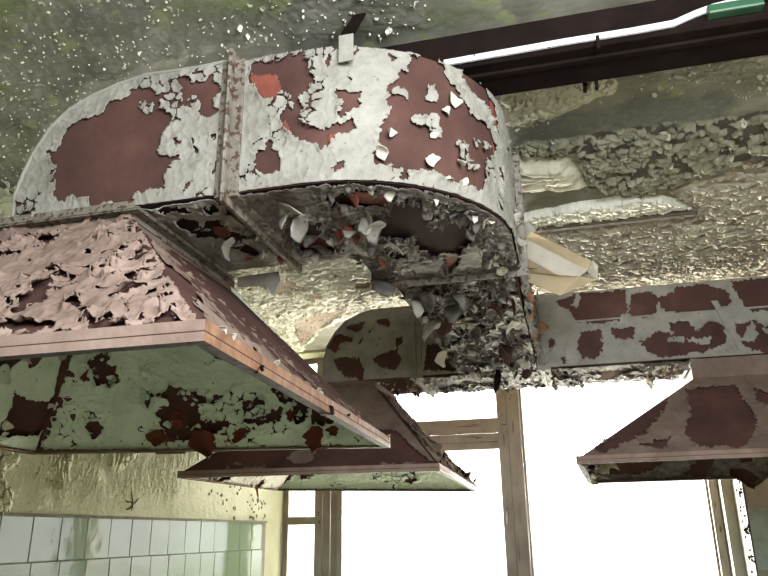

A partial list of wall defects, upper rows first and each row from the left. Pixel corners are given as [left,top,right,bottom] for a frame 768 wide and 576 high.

peeling [0,63,223,218]
peeling [221,45,768,399]
peeling [0,364,12,385]
peeling [140,392,169,411]
peeling [1,420,14,439]
peeling [434,445,477,484]
peeling [585,463,619,485]